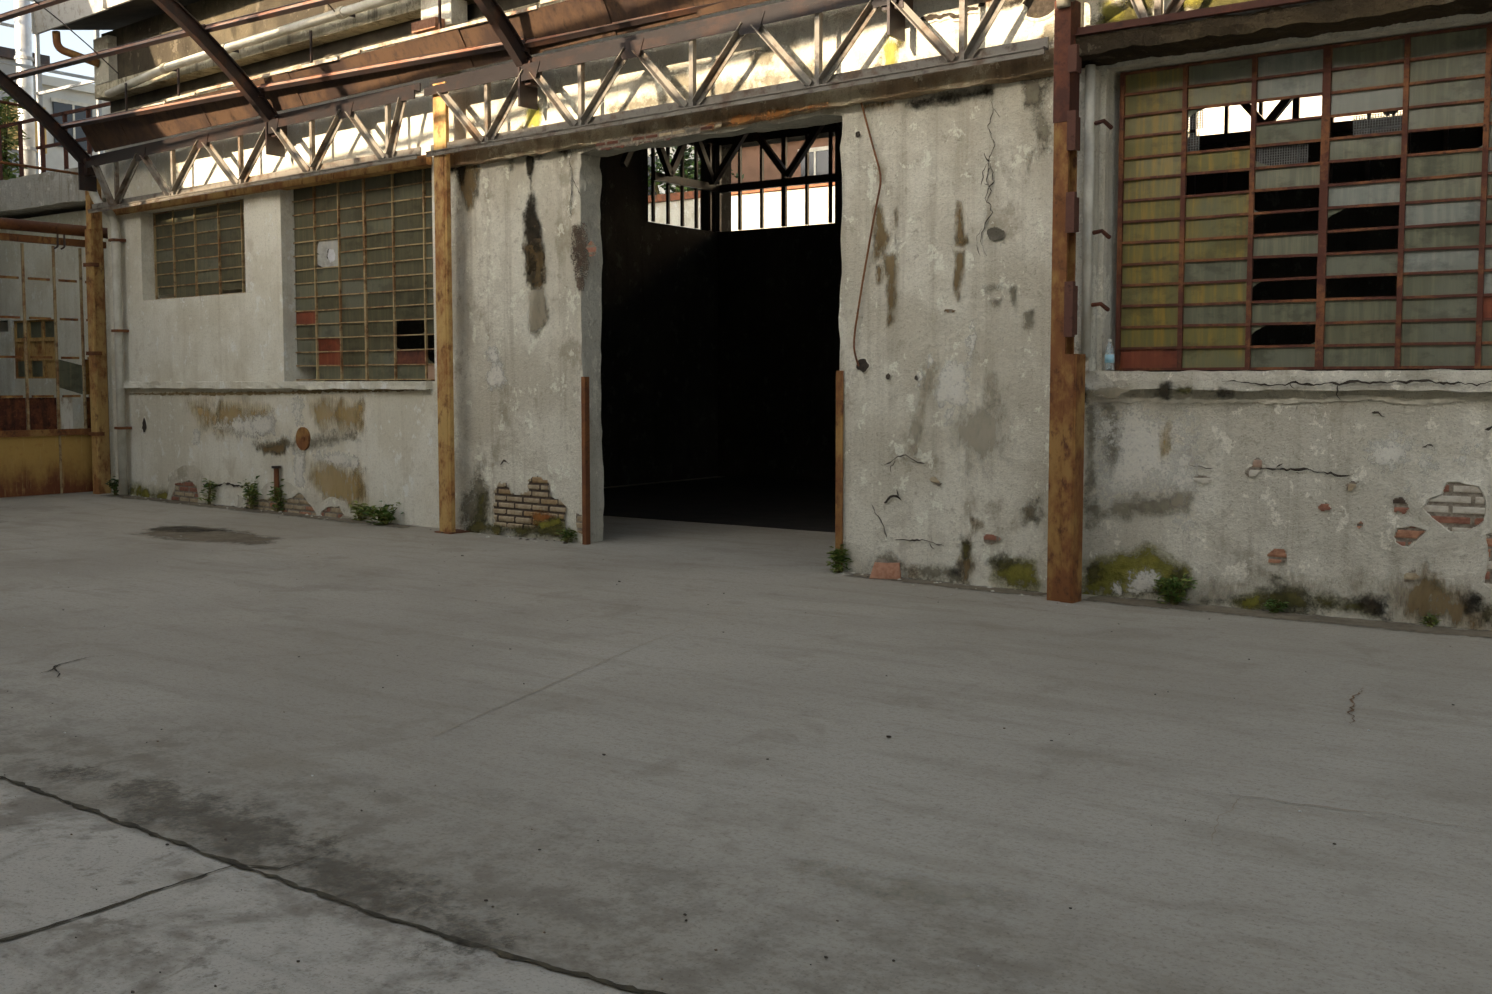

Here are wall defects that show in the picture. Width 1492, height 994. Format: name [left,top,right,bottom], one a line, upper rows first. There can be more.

crack [977,96,1000,256]
water stain [196,403,266,429]
water stain [253,398,363,505]
flaking render [493,476,582,534]
flaking render [1357,454,1492,616]